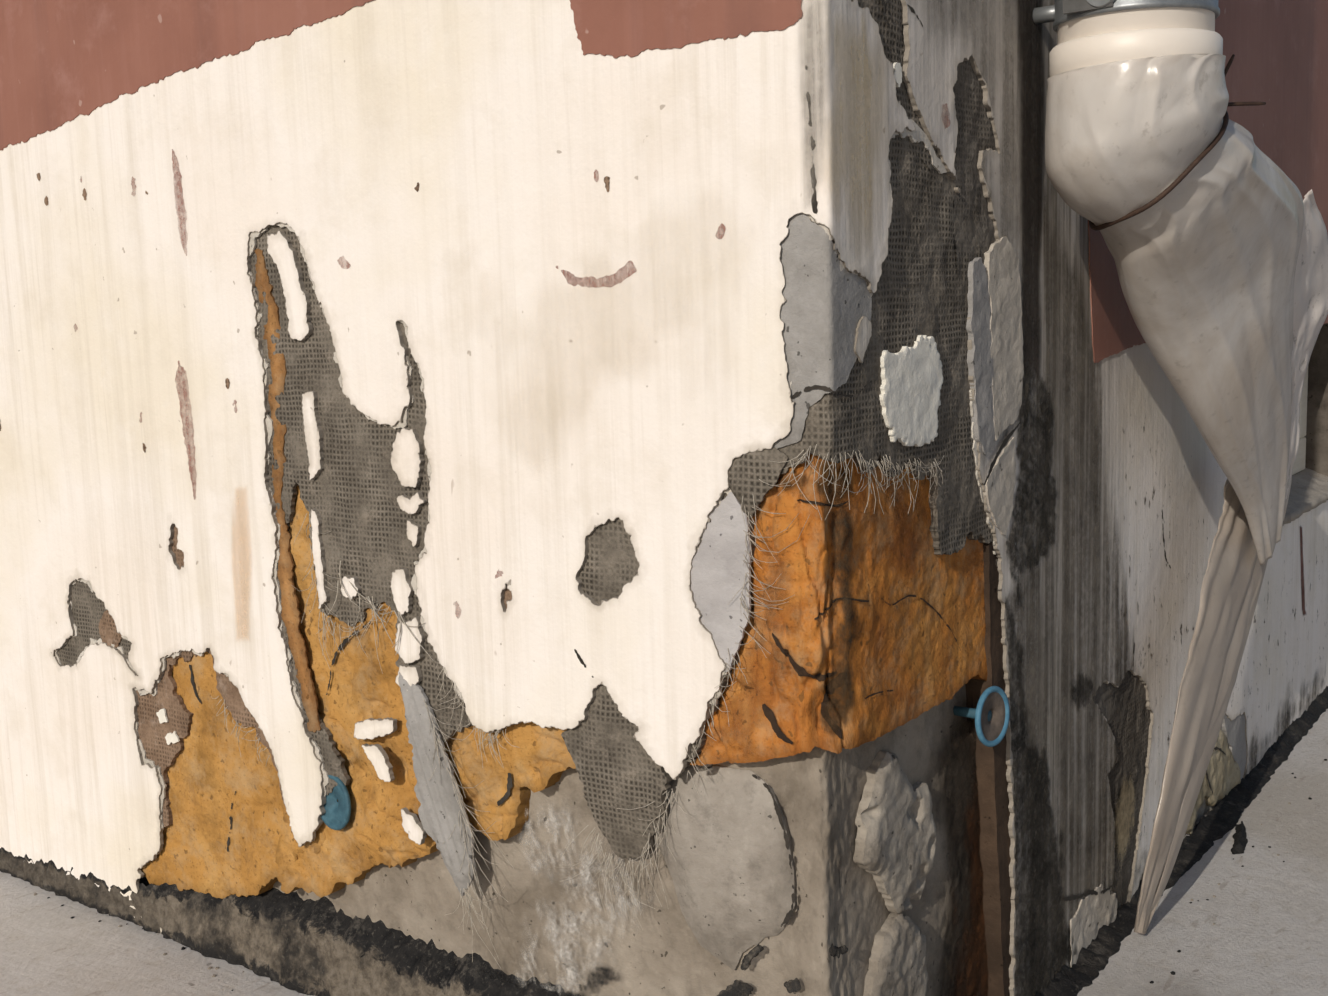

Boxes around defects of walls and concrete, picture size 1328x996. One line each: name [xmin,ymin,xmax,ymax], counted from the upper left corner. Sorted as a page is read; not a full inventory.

spalling [55,0,1012,996]
leakage [935,0,1167,996]
peeling [1094,670,1151,909]
spalling [1184,714,1247,837]
leakage [550,913,615,996]